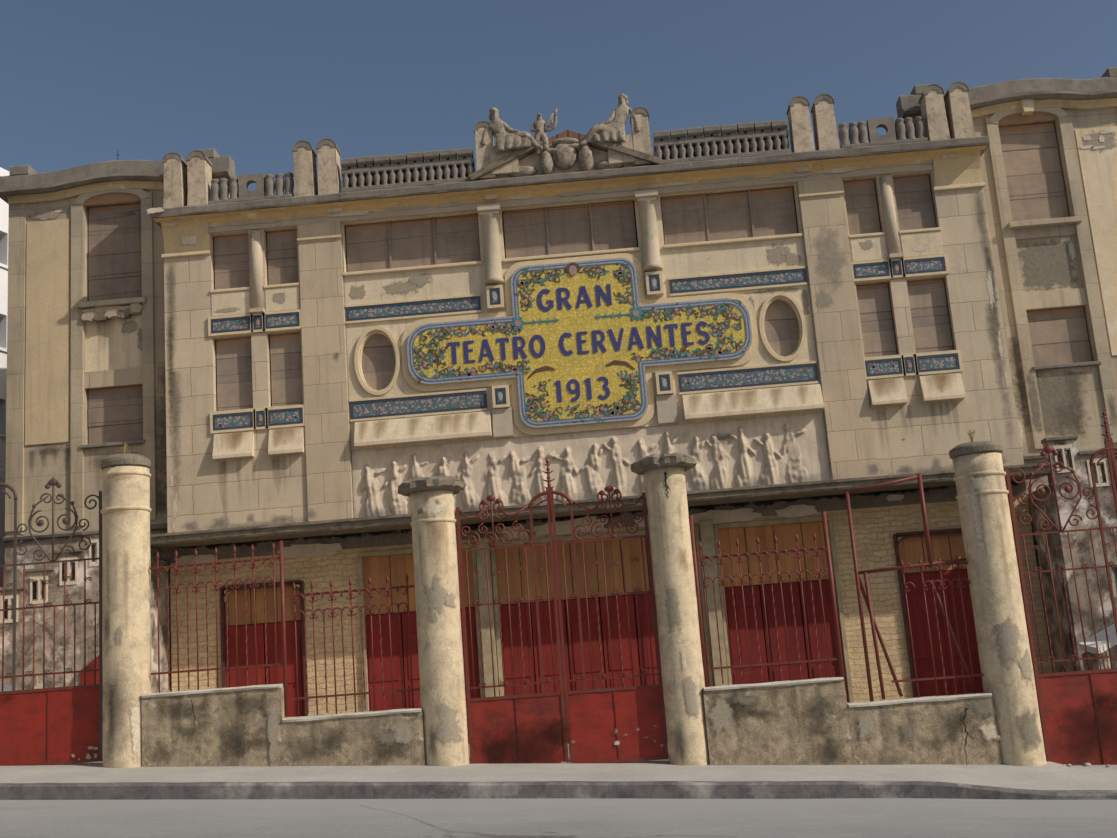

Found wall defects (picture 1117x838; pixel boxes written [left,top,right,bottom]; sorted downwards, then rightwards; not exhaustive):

peeling [1079,130,1115,153]
spalling [349,285,365,300]
spalling [384,273,431,295]
leakage [977,198,993,280]
peeling [1018,237,1078,291]
leakage [989,309,1082,436]
spalling [424,576,456,621]
peeling [665,588,682,633]
spalling [993,617,1033,686]
crack [960,708,973,764]